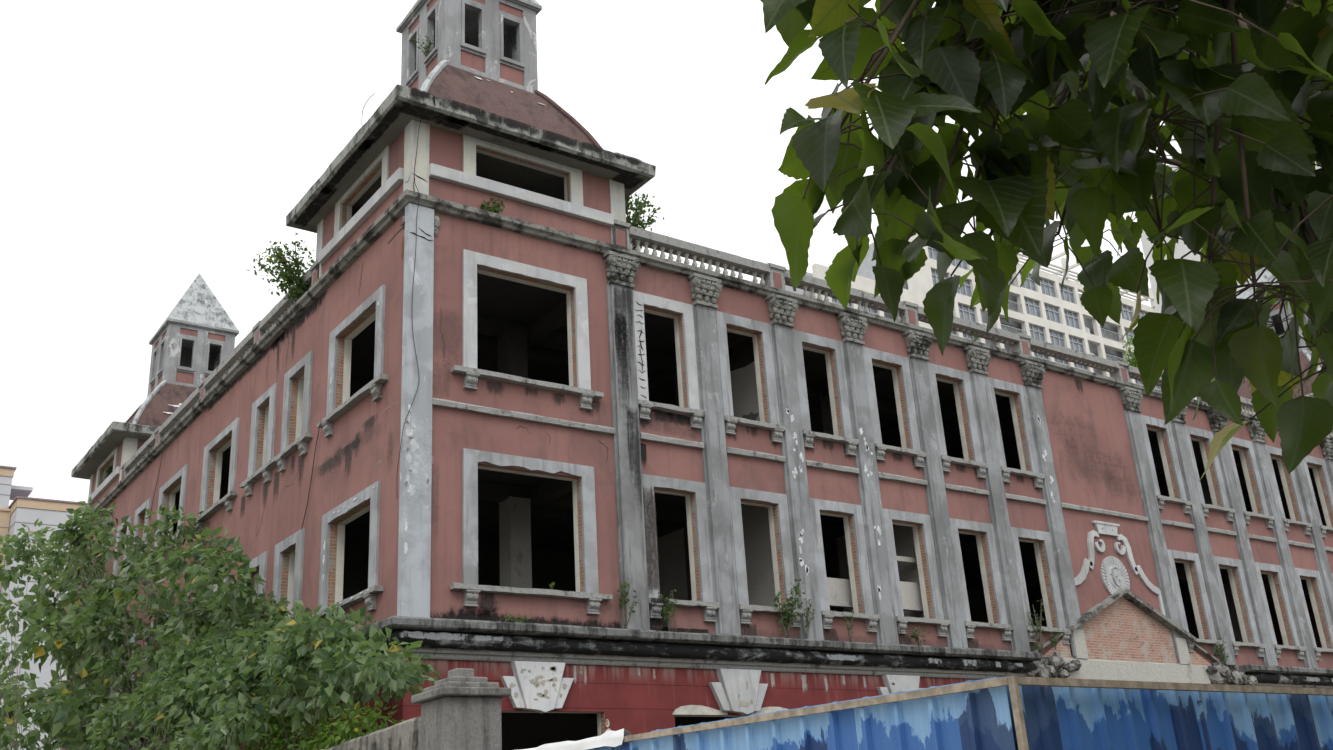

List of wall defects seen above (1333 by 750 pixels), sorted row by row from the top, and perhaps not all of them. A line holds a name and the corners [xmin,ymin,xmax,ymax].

damp [318,416,375,475]
peeling [405,404,429,497]
peeling [786,408,804,478]
damp [263,456,304,502]
peeling [799,529,809,576]
damp [650,598,708,633]
damp [741,624,757,636]
damp [825,629,838,641]